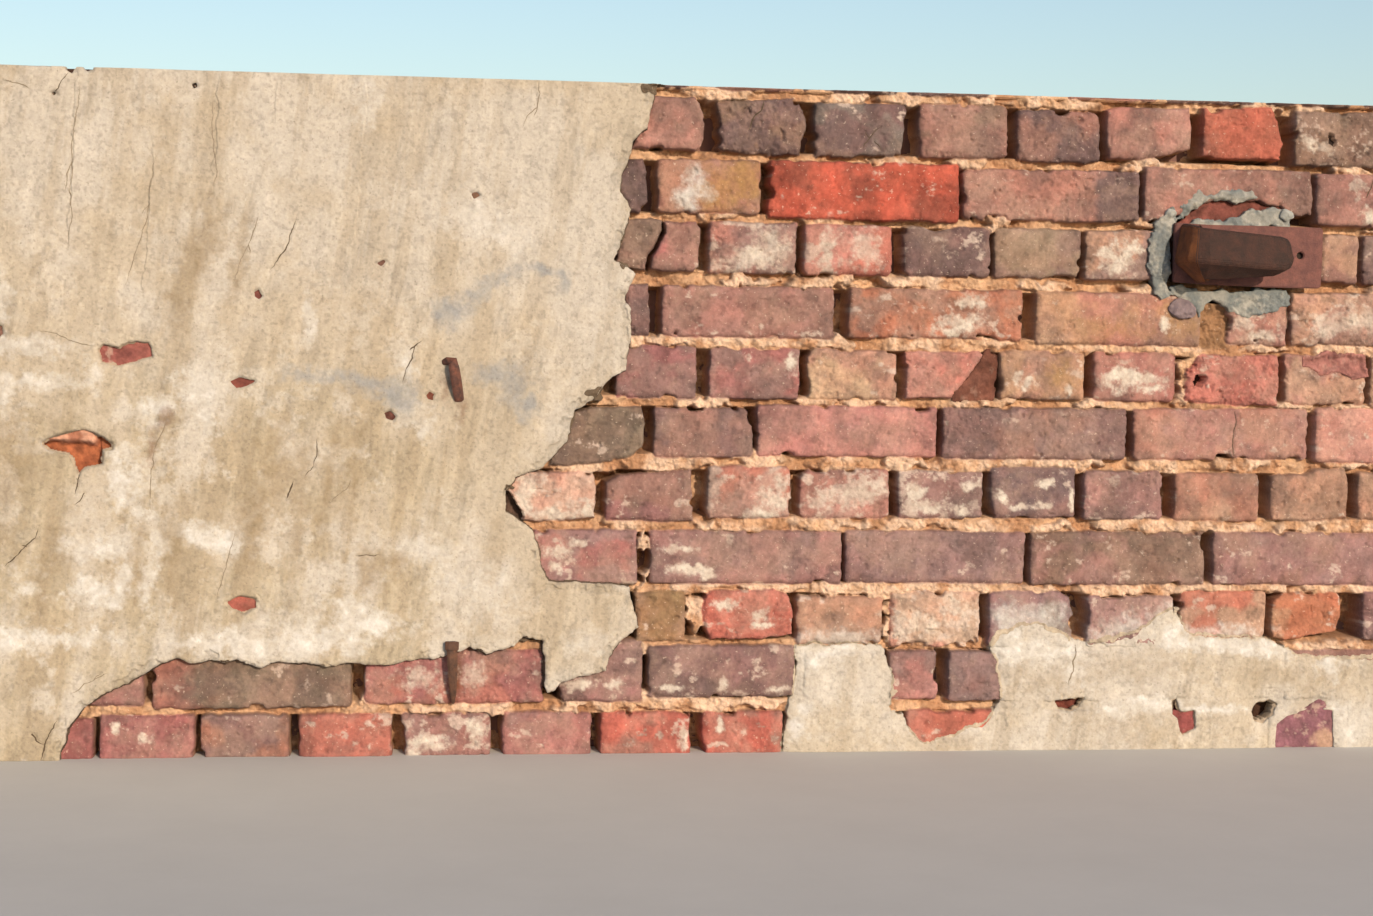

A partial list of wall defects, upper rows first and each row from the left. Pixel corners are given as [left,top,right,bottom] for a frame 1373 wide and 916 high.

flaking render [641,83,666,109]
spalling [1165,200,1294,223]
spalling [98,341,153,367]
corrosion [436,365,471,429]
spalling [951,349,998,402]
spalling [1302,350,1369,380]
spalling [42,429,113,474]
flaking render [505,472,638,625]
flaking render [60,658,179,760]
corrosion [443,651,465,723]
flaking render [519,636,562,692]
flaking render [780,606,1373,751]